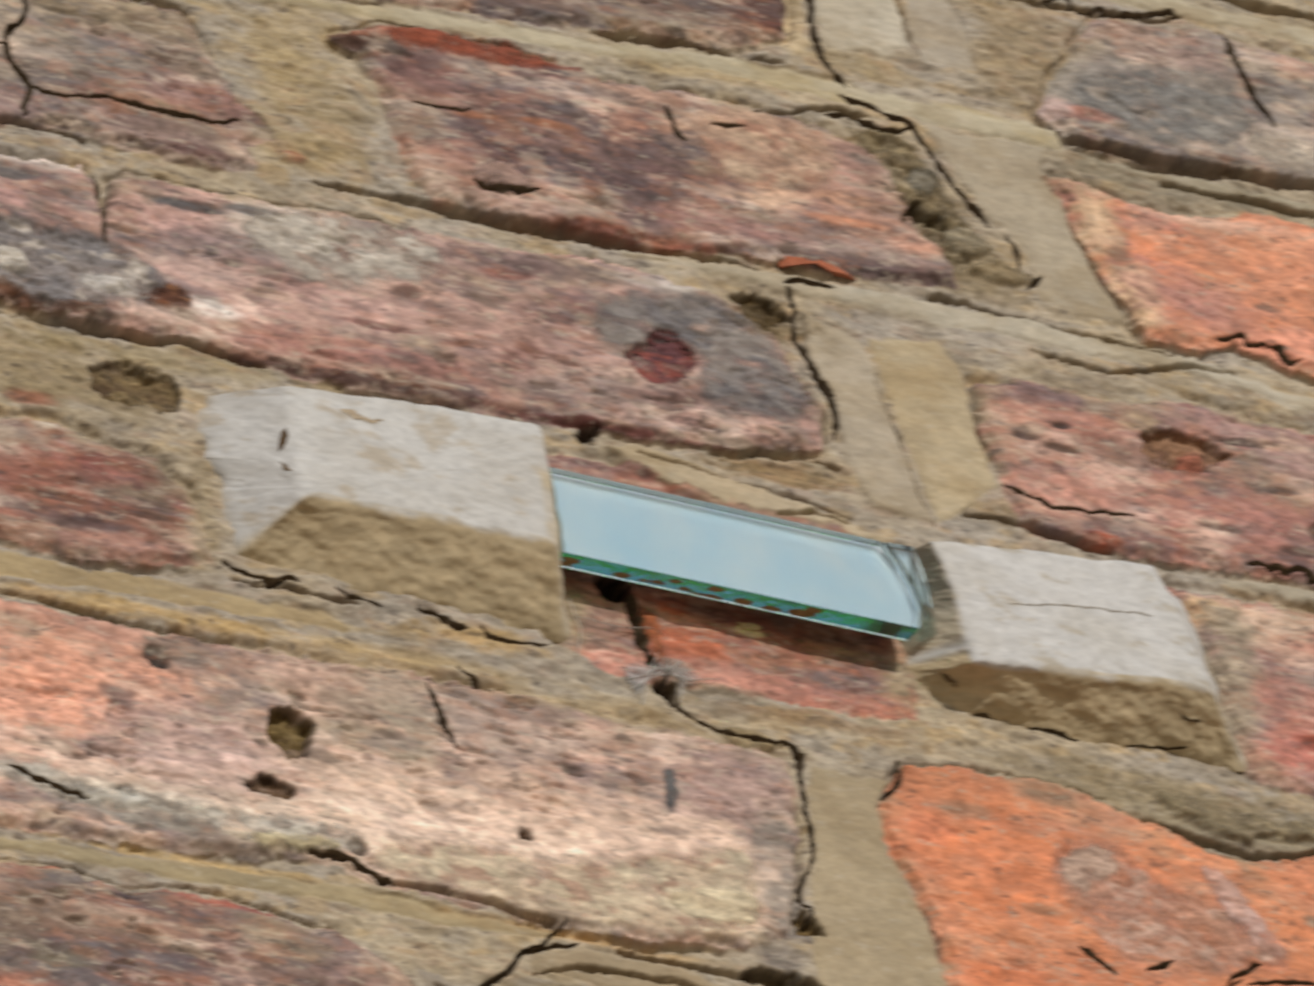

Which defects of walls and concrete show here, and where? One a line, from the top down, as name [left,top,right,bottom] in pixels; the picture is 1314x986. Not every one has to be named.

crack [0,0,241,125]
crack [1219,33,1275,128]
crack [805,0,1043,290]
spalling [624,328,696,383]
crack [784,277,839,441]
crack [1216,332,1303,367]
crack [1003,484,1136,517]
crack [1247,561,1314,584]
crack [606,579,815,933]
crack [480,924,580,986]